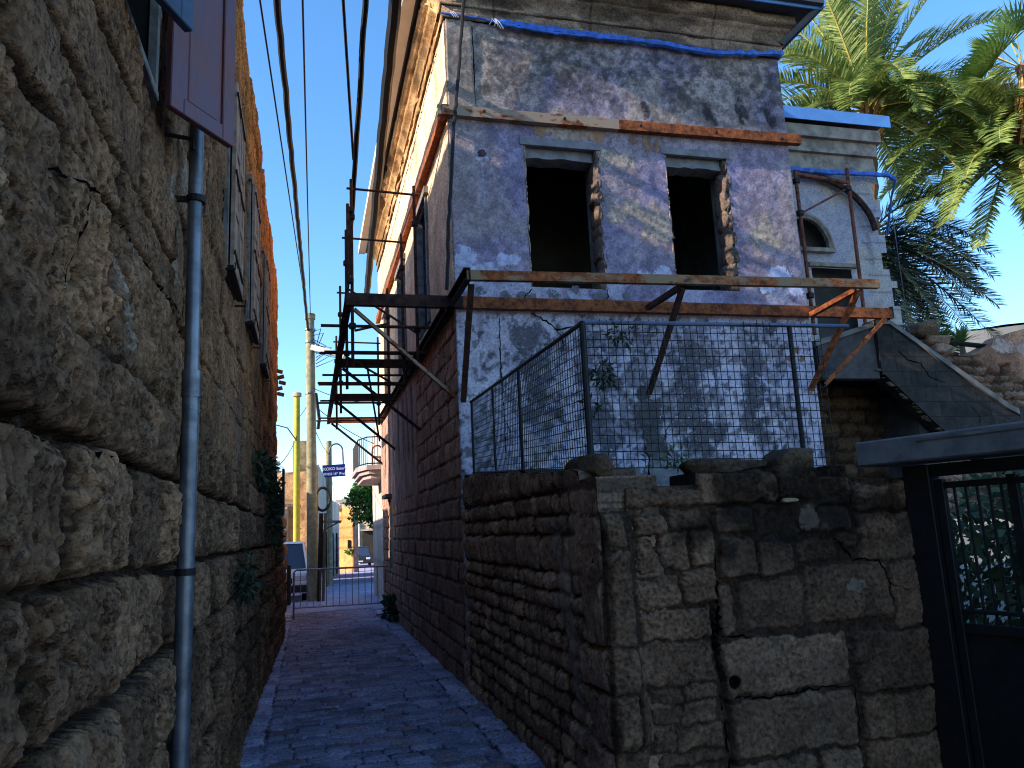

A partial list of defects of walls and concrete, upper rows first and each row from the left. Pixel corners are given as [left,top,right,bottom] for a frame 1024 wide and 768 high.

corrosion [533,126,605,143]
crack [47,167,100,282]
spalling [454,144,677,301]
crack [117,223,183,315]
crack [517,289,572,350]
peeling [991,338,1024,356]
crack [833,538,910,604]